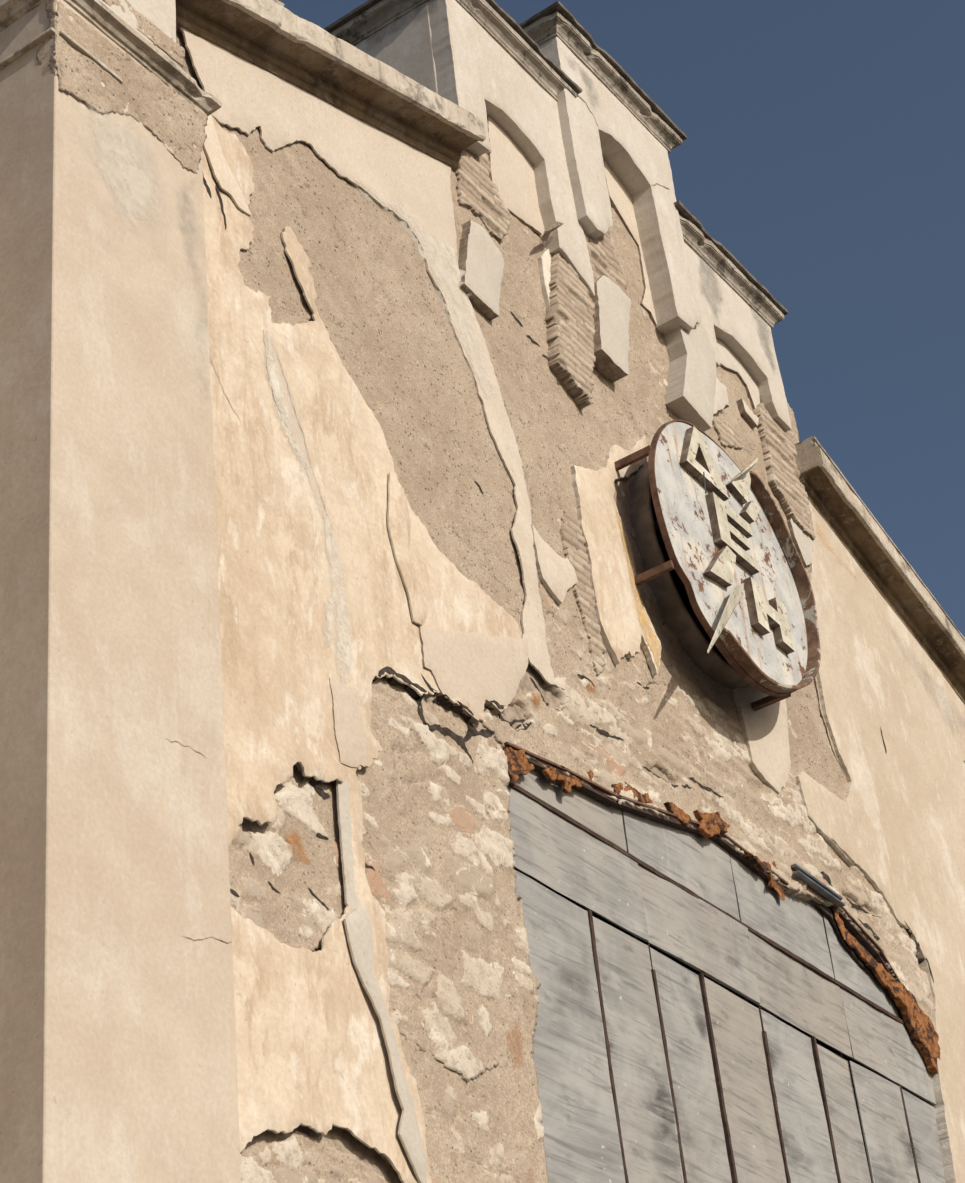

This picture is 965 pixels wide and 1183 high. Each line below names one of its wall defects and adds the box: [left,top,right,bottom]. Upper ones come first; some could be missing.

flaking render [36,0,525,636]
flaking render [357,147,933,1183]
flaking render [229,763,346,952]
rust [503,747,594,794]
rust [611,782,730,839]
rust [743,853,785,901]
rust [831,906,941,1075]
flaking render [240,1131,394,1183]